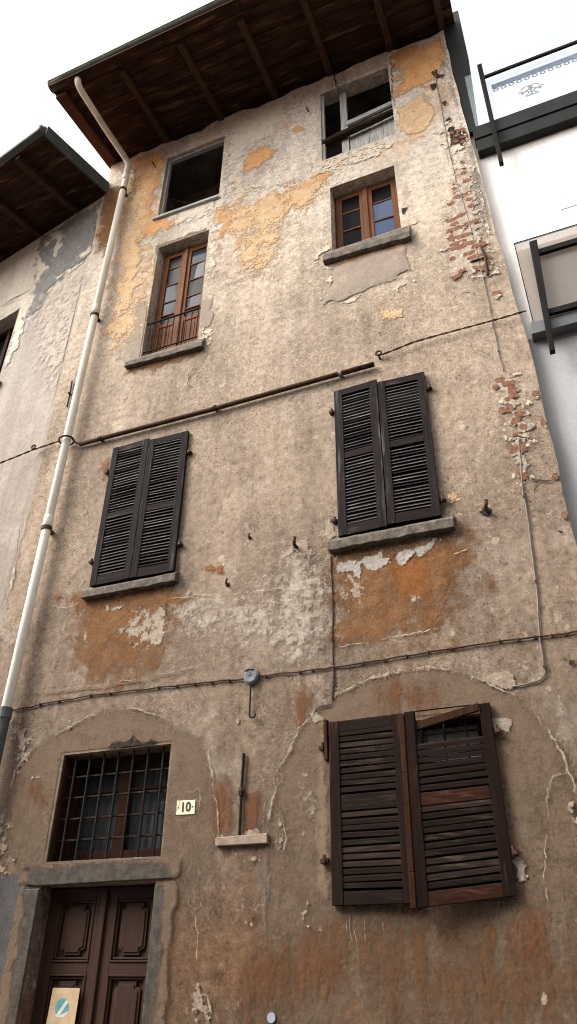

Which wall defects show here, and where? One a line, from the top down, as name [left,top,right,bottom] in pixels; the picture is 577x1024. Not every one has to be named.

flaking render [387,38,501,299]
peeling [98,95,393,368]
peeling [4,199,102,366]
flaking render [487,369,547,486]
peeling [334,537,441,613]
peeling [105,602,167,651]
crack [287,665,515,753]
crack [177,745,219,829]
crack [268,785,277,820]
crack [538,717,577,806]
crack [541,837,549,900]
peeling [191,982,212,1024]